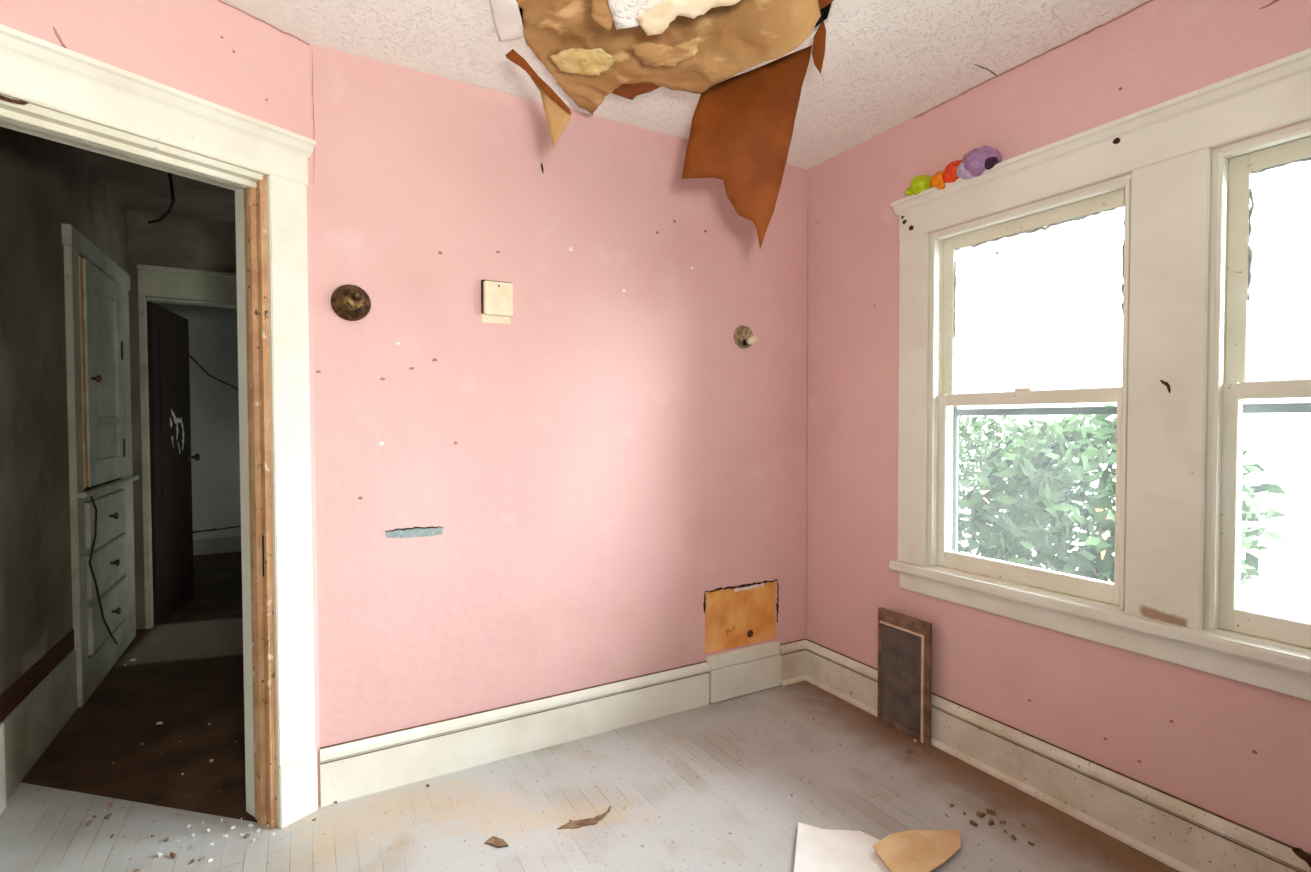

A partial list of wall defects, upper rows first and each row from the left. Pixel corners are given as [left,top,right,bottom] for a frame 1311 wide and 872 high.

crack [914,0,1154,118]